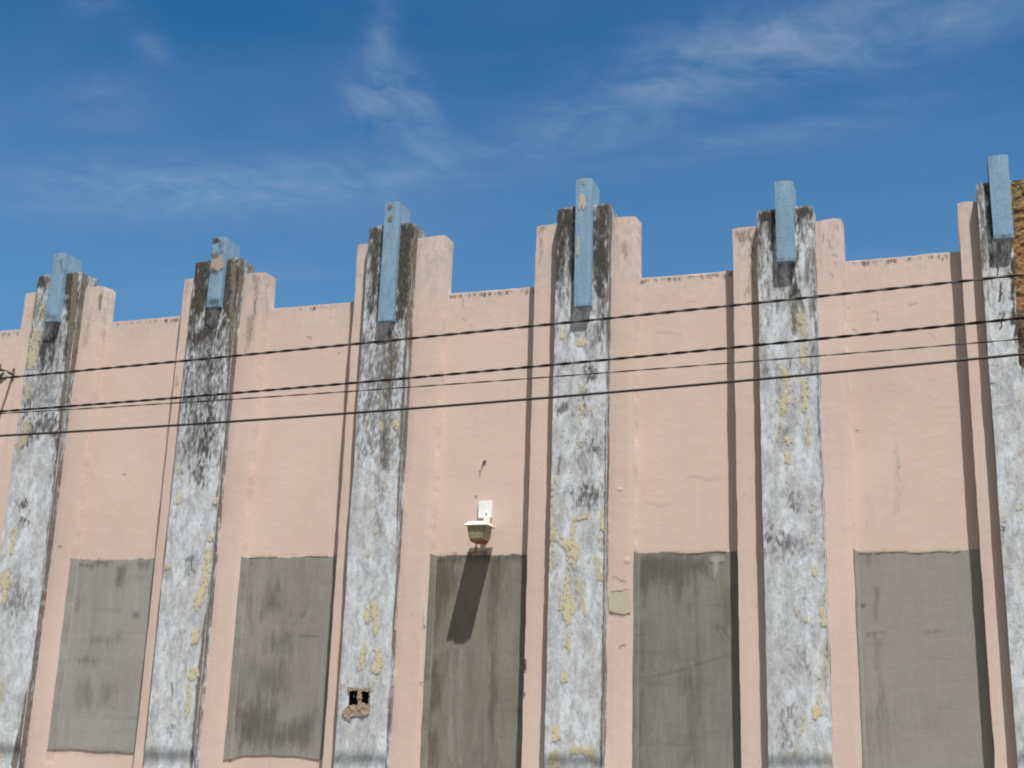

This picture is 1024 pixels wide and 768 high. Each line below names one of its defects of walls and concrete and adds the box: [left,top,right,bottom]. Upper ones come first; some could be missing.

water stain [37,273,80,369]
water stain [138,252,240,486]
water stain [393,224,414,324]
water stain [556,208,575,288]
water stain [592,205,613,298]
water stain [736,211,801,333]
peeling [776,227,825,555]
water stain [984,181,1016,262]
peeling [185,447,222,767]
spalling [342,600,383,721]
peeling [547,363,607,768]
peeling [795,565,829,684]